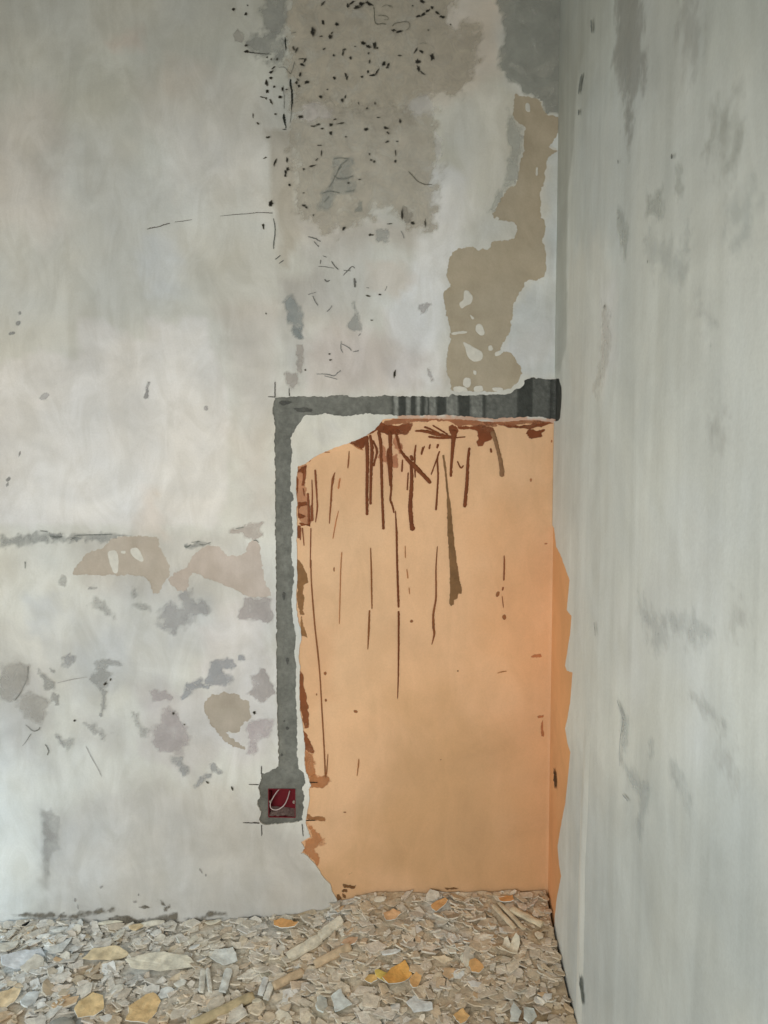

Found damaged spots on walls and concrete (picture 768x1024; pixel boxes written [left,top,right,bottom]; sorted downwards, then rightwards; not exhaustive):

crack [373,4,427,44]
crack [249,32,296,130]
spalling [260,46,310,115]
spalling [310,20,435,99]
crack [224,212,284,264]
peeling [443,94,558,392]
corrosion [350,419,552,468]
peeling [73,535,271,598]
peeling [296,418,572,939]
peeling [204,691,256,750]